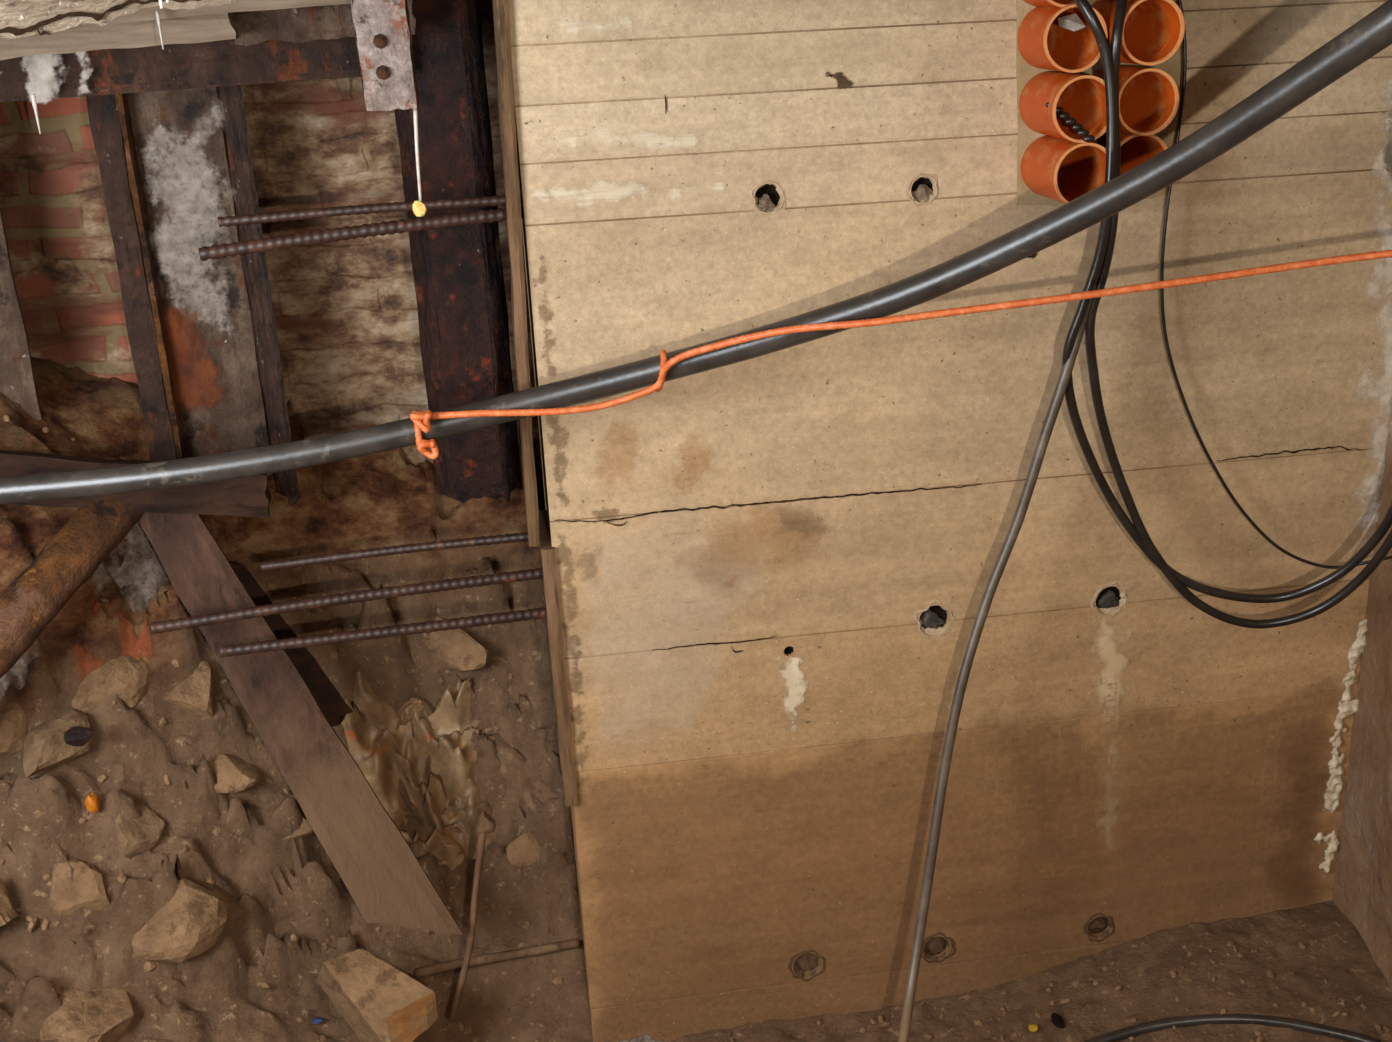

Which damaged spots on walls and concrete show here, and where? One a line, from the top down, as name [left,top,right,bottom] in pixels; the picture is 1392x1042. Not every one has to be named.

crack [0,0,200,36]
damp [146,107,229,331]
damp [748,657,807,751]
damp [882,623,1141,747]
damp [1324,619,1368,813]
damp [1313,830,1340,877]